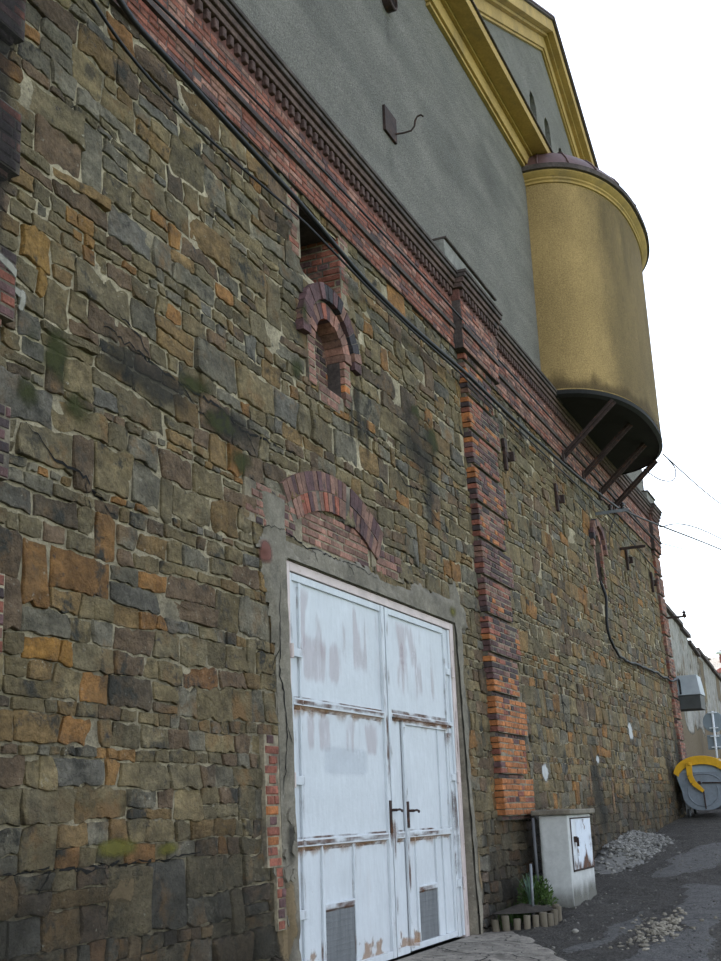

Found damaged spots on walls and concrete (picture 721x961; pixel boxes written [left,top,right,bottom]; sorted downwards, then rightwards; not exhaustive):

crack [272,585,293,793]
rust [400,931,421,948]
rust [362,940,383,960]